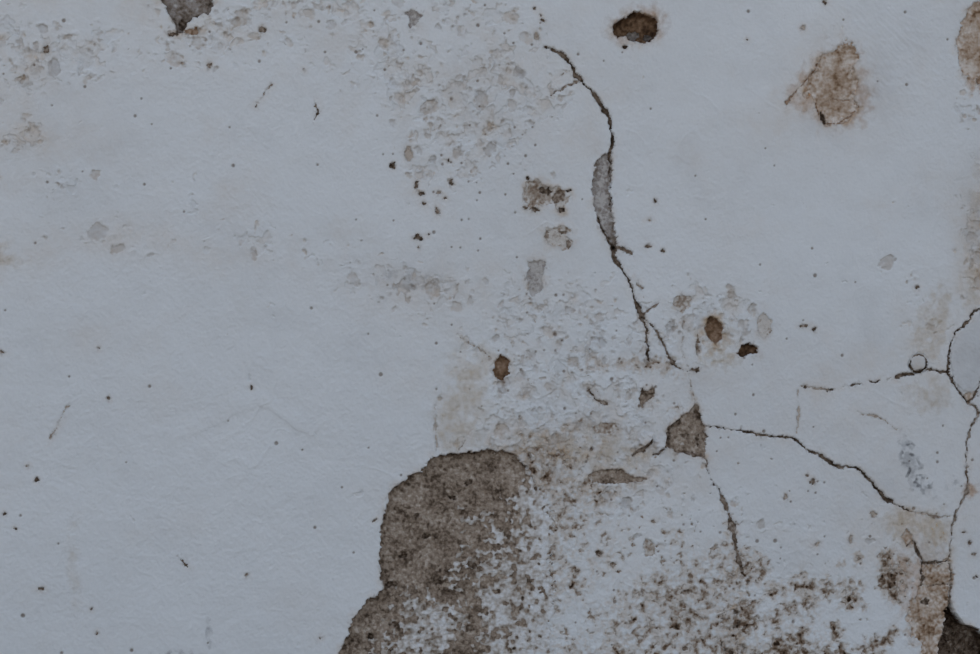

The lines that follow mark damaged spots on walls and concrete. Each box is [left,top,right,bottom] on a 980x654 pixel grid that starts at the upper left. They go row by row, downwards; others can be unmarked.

flaking render [161,0,213,37]
spalling [622,32,652,49]
flaking render [956,1,980,90]
flaking render [785,39,859,127]
spalling [539,187,572,213]
crack [545,46,694,396]
crack [587,389,608,405]
crack [631,440,667,457]
flaking render [639,403,708,458]
crack [703,308,980,603]
flaking render [339,418,955,654]